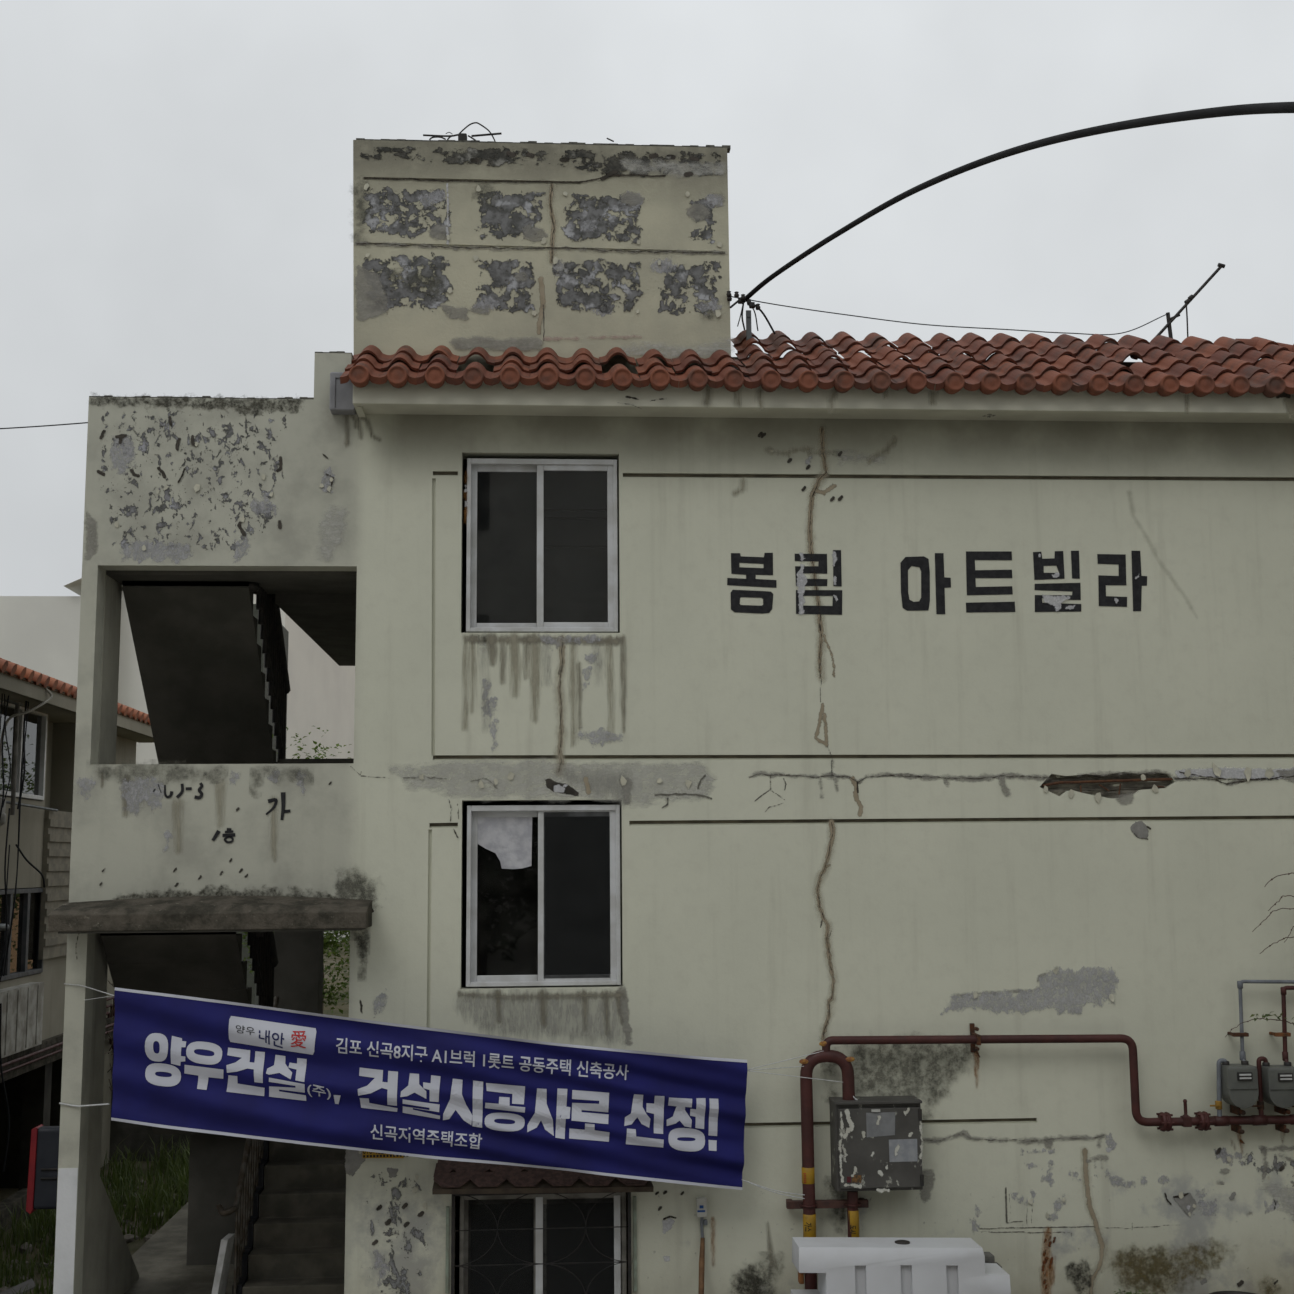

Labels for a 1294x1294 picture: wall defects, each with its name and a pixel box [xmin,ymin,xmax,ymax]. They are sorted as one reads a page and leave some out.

peeling [355,146,724,321]
peeling [86,396,301,564]
damp [464,634,626,750]
crack [749,427,1048,1040]
damp [101,765,306,852]
spalling [1040,762,1294,805]
crack [1174,776,1294,785]
damp [115,858,375,912]
damp [853,1044,969,1101]
peeling [345,1149,426,1294]
damp [733,1232,775,1294]
peeling [1106,1146,1294,1216]